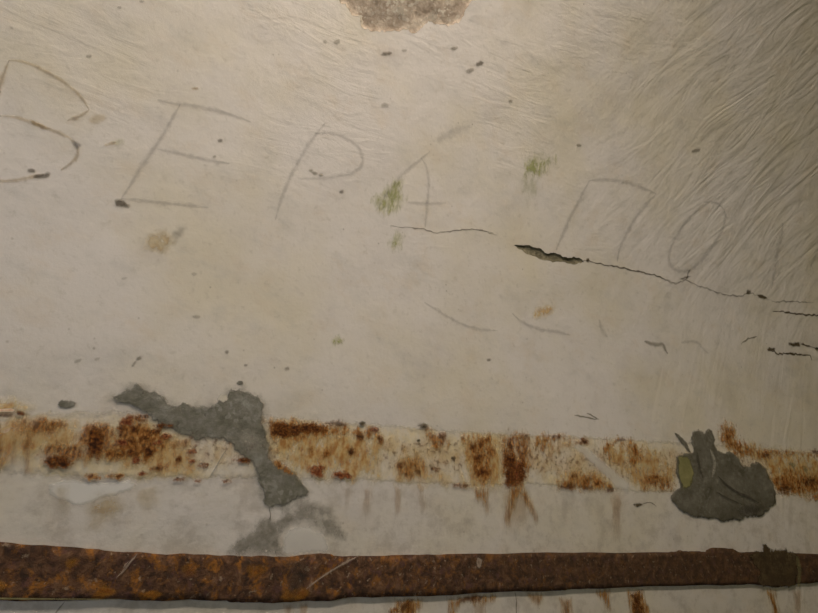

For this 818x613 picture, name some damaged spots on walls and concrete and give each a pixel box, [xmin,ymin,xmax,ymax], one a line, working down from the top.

spalling [339,0,475,33]
crack [395,225,493,233]
crack [515,245,675,284]
crack [747,290,818,316]
corrosion [0,403,209,482]
peeling [113,381,308,507]
corrosion [269,416,384,481]
corrosion [454,432,588,519]
peeling [671,429,776,522]
corrosion [718,420,818,501]
corrosion [0,542,781,613]
corrosion [795,553,818,584]